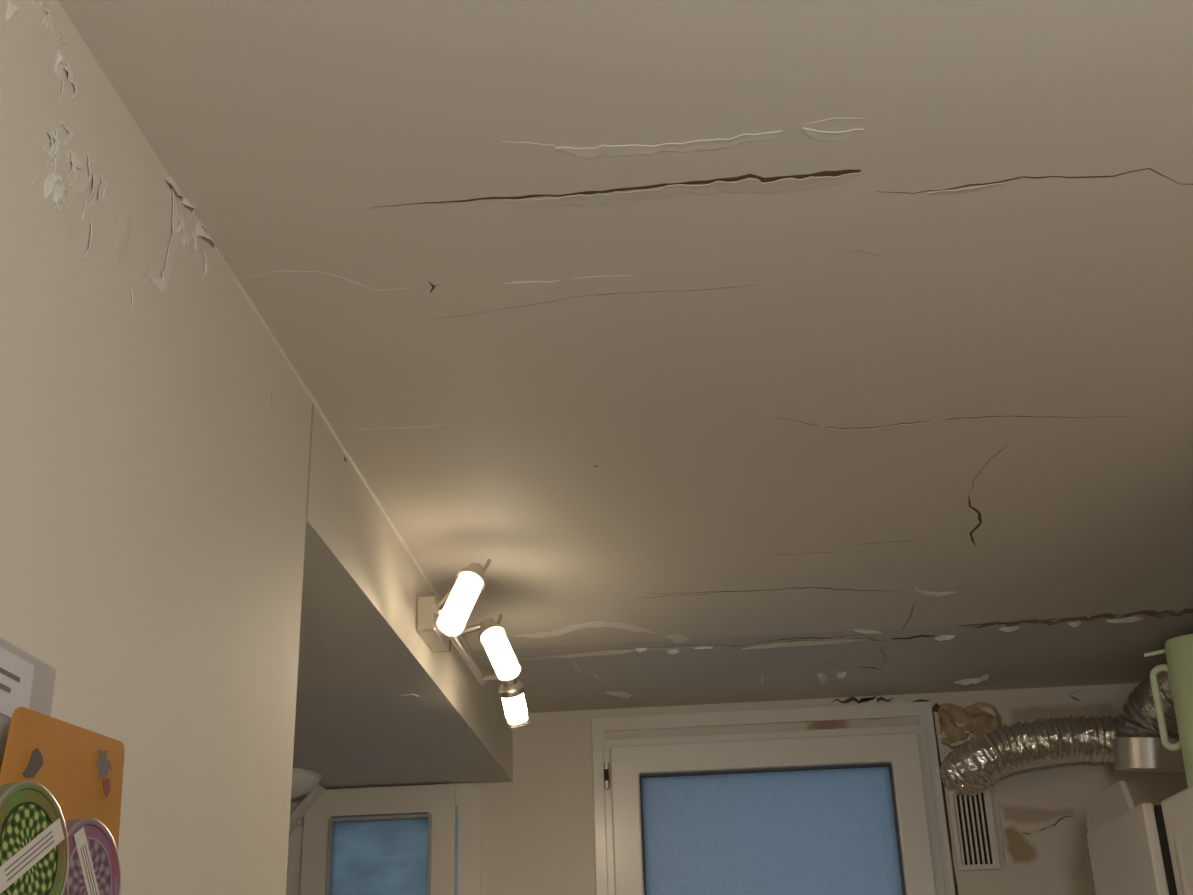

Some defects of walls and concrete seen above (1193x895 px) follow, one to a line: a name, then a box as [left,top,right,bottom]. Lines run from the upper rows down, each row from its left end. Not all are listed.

peeling [504,131,782,158]
peeling [802,118,867,141]
crack [367,169,861,209]
crack [889,168,1193,194]
peeling [82,174,107,259]
crack [433,284,760,320]
crack [777,416,1126,432]
crack [968,444,1010,546]
crack [520,586,1193,895]